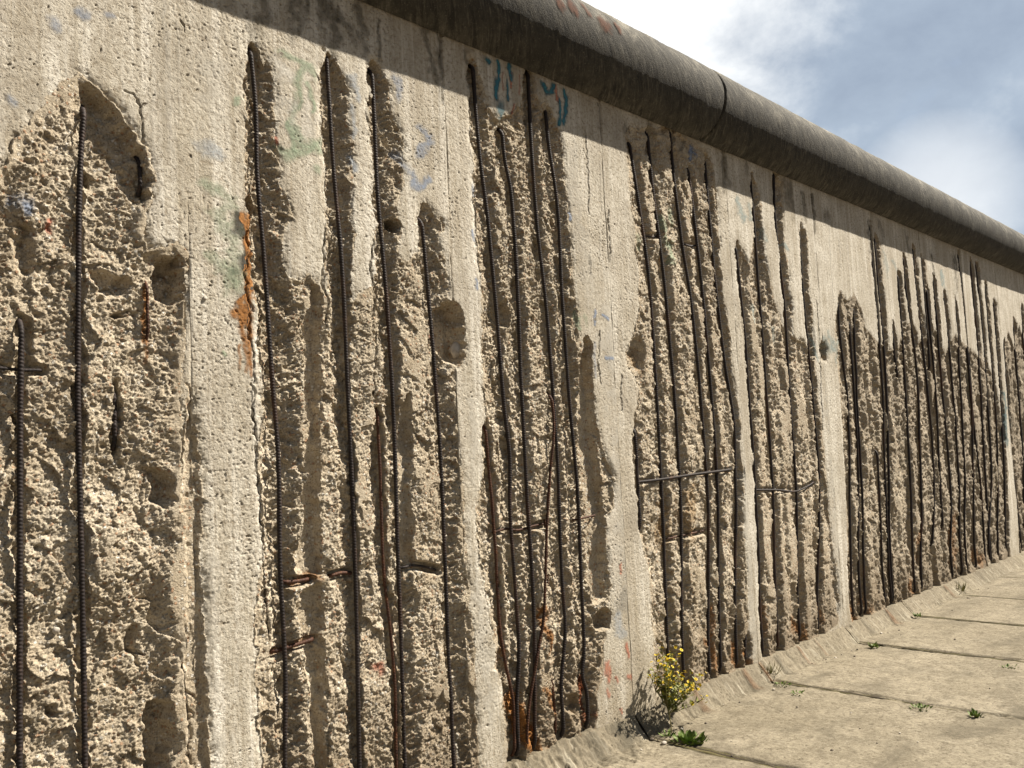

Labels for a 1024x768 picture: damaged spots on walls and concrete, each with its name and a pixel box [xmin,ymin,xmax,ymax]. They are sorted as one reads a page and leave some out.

spalling [0,71,211,768]
corrosion [231,212,254,375]
spalling [253,416,282,768]
spalling [287,273,352,768]
spalling [349,283,394,768]
spalling [394,252,467,768]
spalling [459,63,583,768]
corrosion [504,691,538,751]
spalling [605,125,750,697]
spalling [738,242,1024,656]